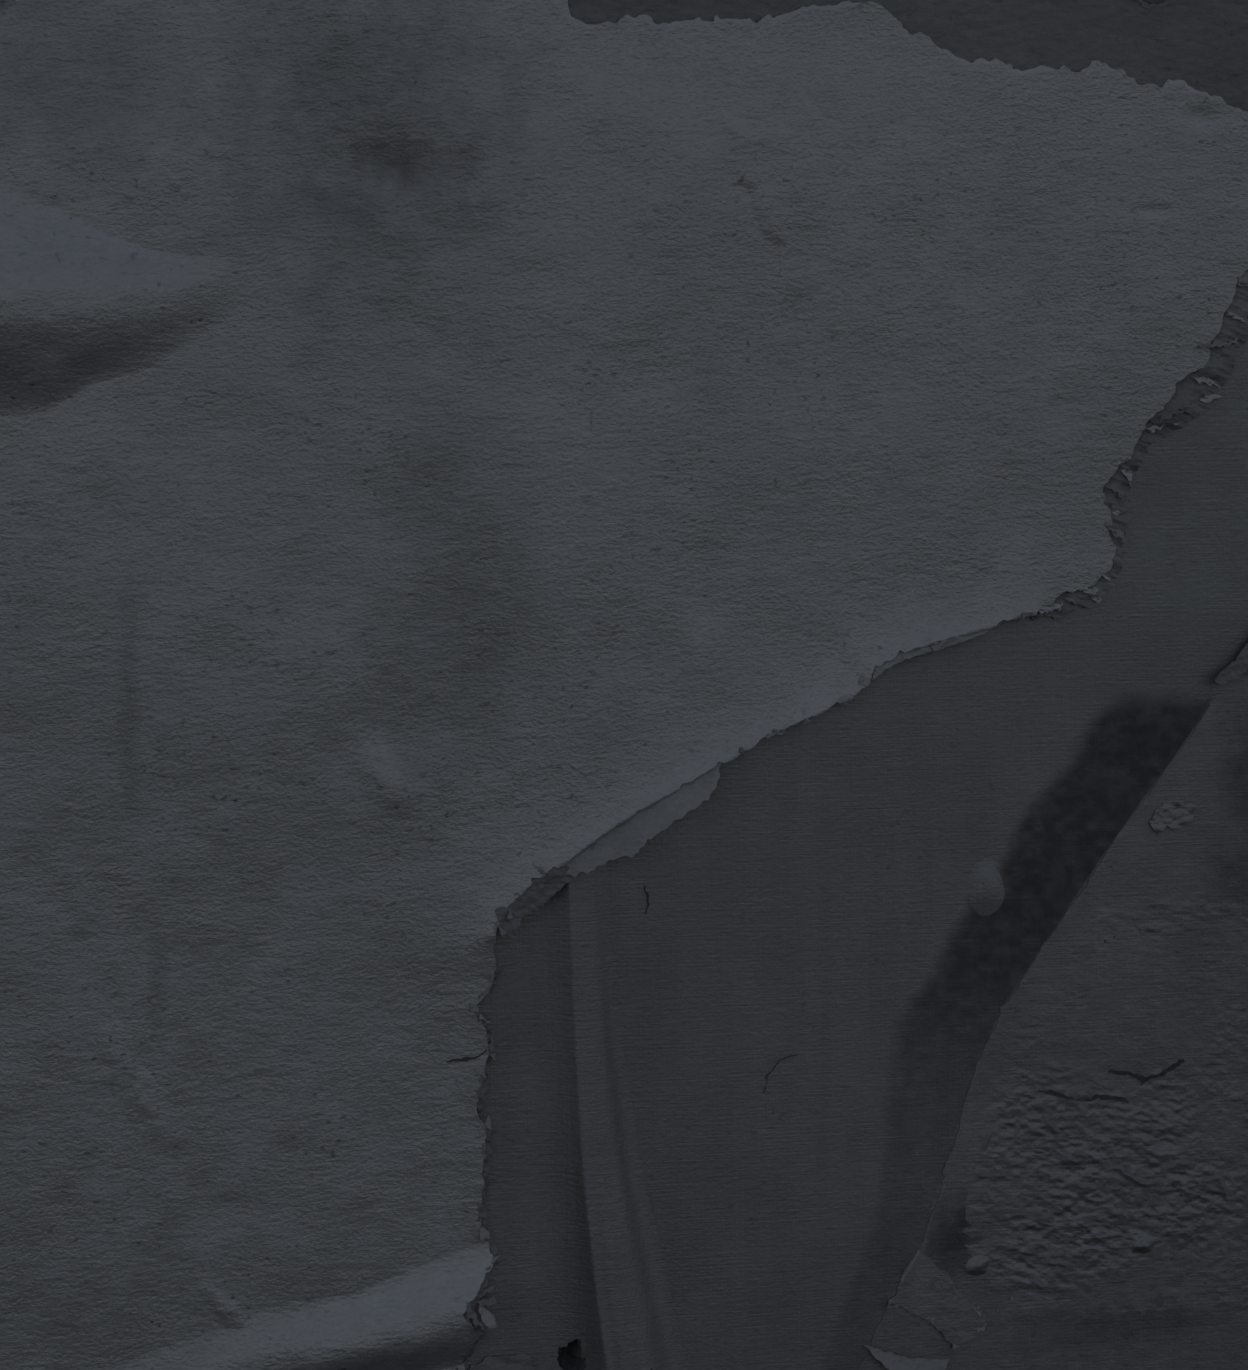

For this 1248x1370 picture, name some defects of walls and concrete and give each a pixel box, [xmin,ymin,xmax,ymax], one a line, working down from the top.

peeling [495,865,574,936]
peeling [941,870,1248,1352]
peeling [864,1345,949,1370]